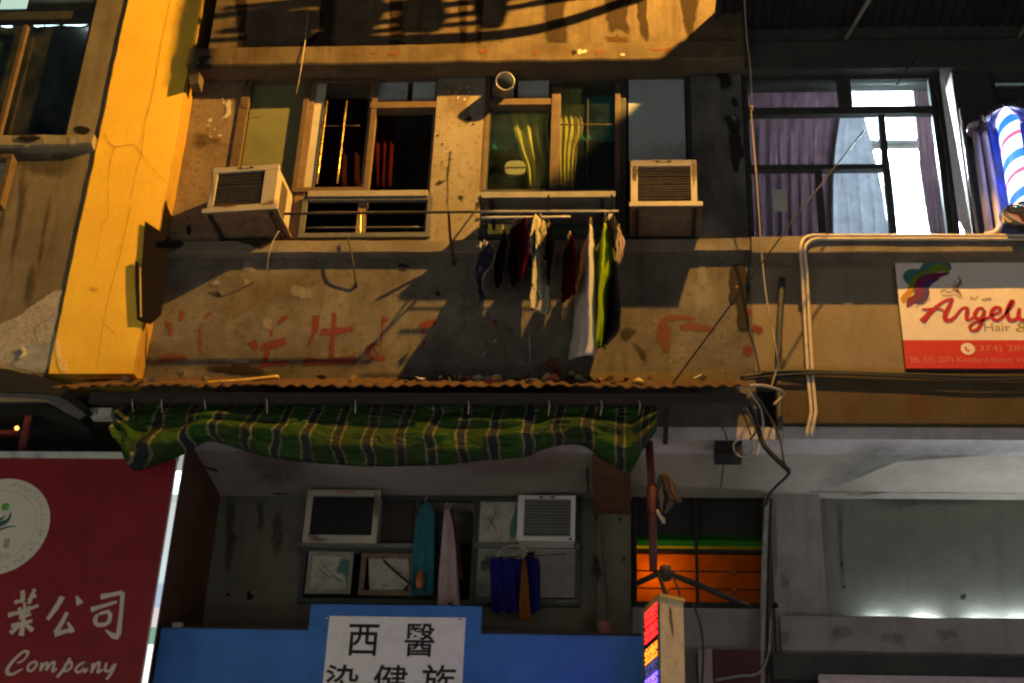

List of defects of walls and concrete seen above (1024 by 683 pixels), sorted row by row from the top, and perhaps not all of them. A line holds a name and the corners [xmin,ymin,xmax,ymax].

damp [716,73,742,133]
crack [90,1,182,365]
peeling [0,290,121,379]